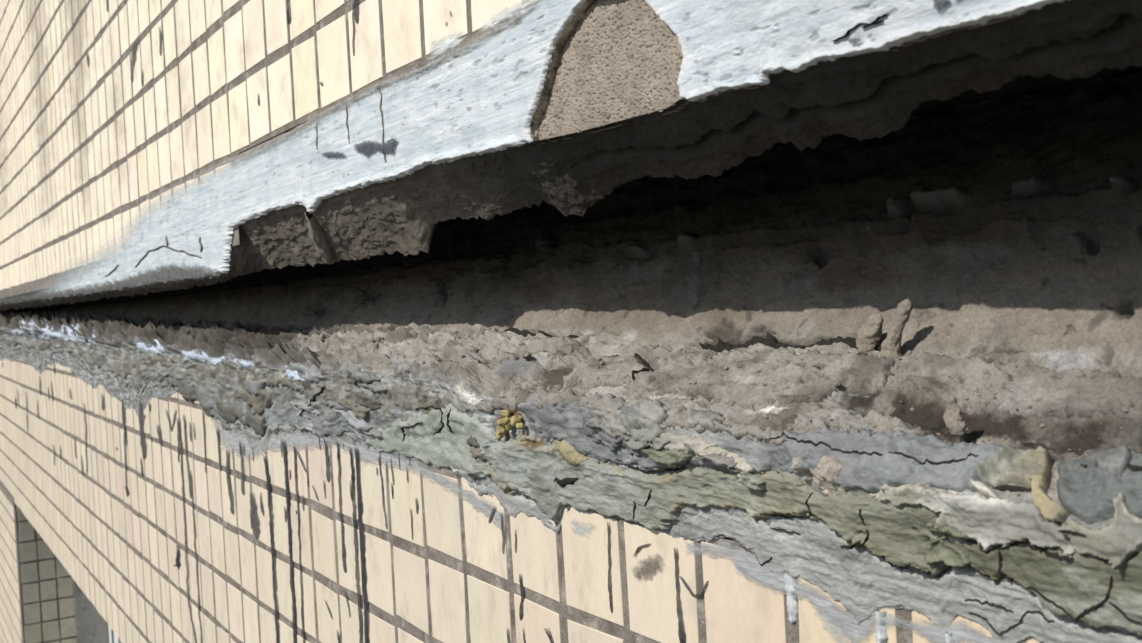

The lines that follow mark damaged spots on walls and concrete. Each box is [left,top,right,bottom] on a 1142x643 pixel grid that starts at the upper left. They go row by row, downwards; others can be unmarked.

spalling [530,0,690,146]
crack [105,236,203,276]
water stain [116,402,370,643]
water stain [376,452,411,530]
water stain [506,576,526,643]
water stain [634,544,660,579]
water stain [674,551,708,643]
crack [740,544,772,566]
crack [765,432,979,465]
crack [839,509,1142,635]
peeling [869,445,1142,569]
crack [1126,463,1142,472]